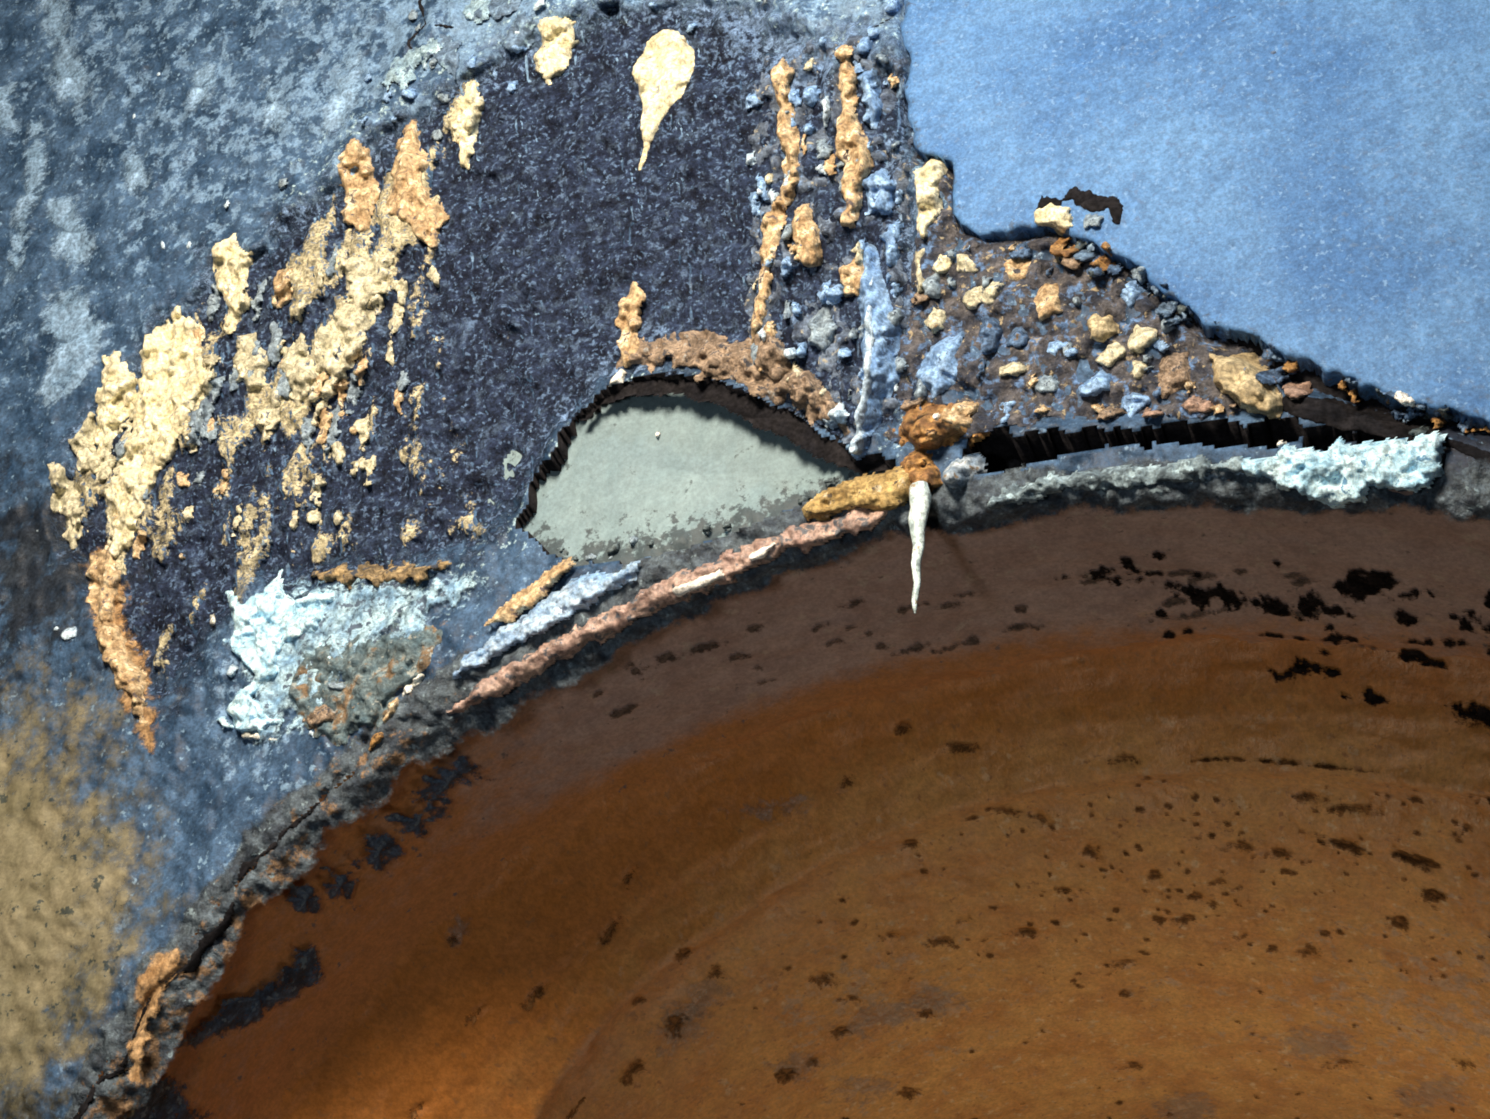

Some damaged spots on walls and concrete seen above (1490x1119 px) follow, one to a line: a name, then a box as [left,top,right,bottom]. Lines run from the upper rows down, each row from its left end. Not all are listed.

spalling [46,0,1313,726]
water stain [1394,391,1420,407]
water stain [1241,430,1448,509]
corrosion [90,584,156,752]
water stain [210,569,486,743]
spalling [288,623,443,752]
water stain [1054,552,1490,683]
water stain [1341,688,1389,706]
water stain [1444,702,1490,727]
crack [73,802,320,1119]